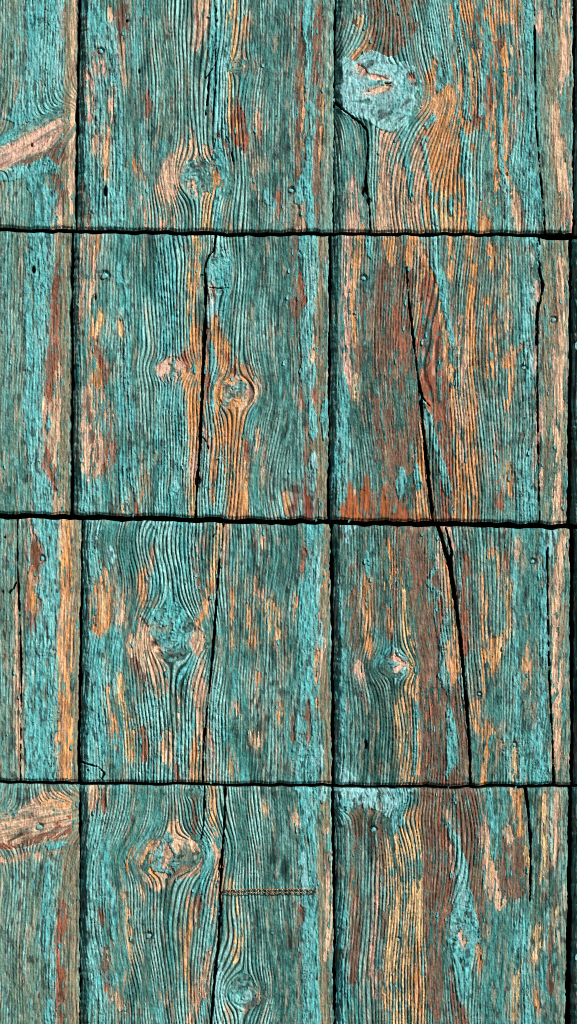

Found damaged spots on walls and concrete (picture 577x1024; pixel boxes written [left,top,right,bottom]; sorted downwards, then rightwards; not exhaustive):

peeling [0,0,281,1024]
crack [195,236,228,1024]
crack [335,102,370,235]
crack [405,268,472,788]
peeling [340,0,577,1024]